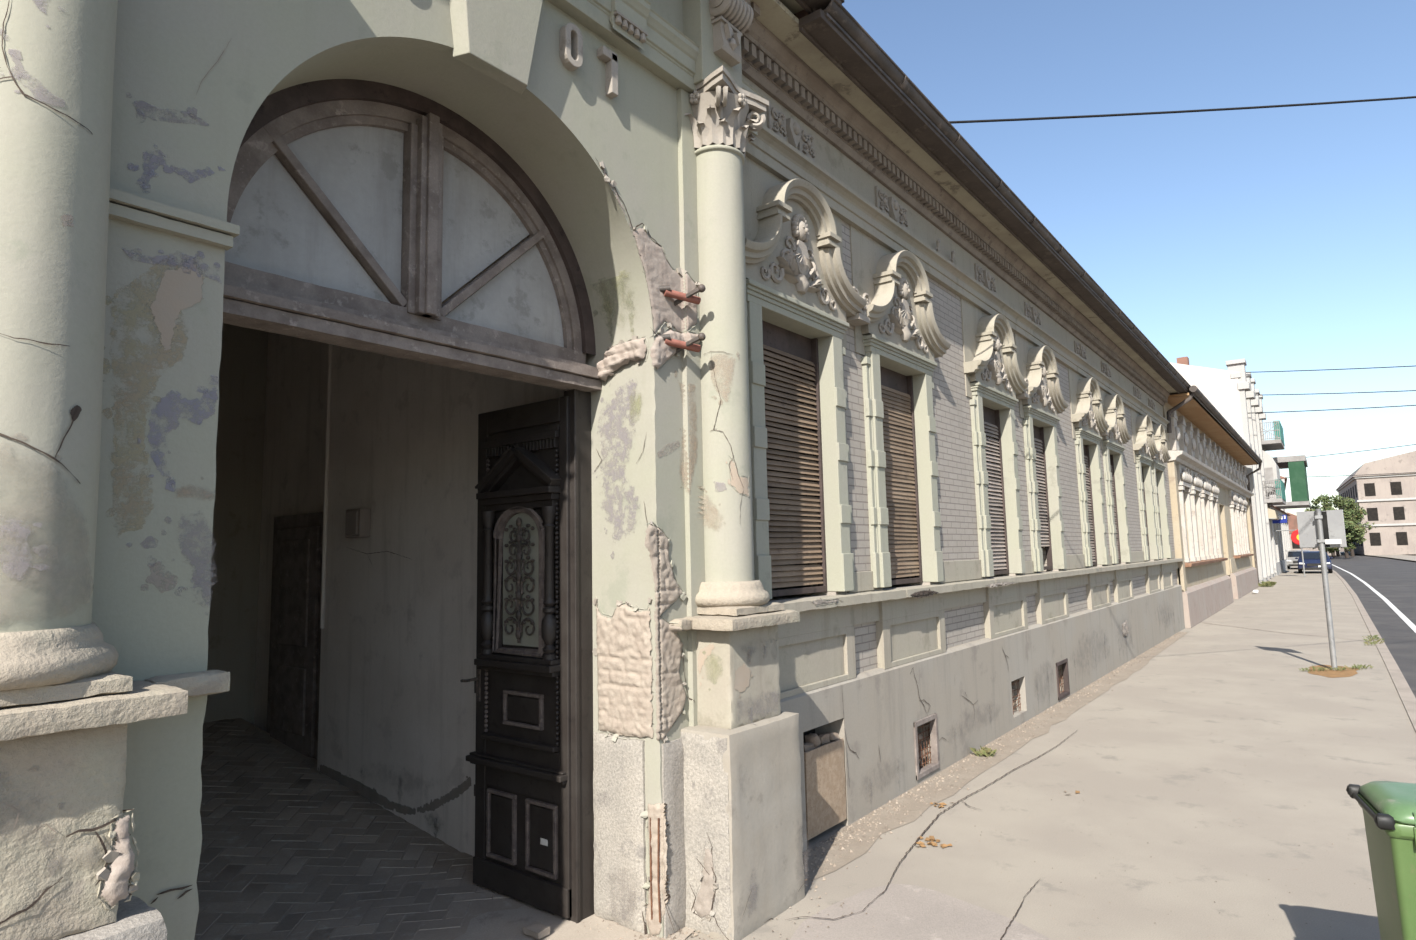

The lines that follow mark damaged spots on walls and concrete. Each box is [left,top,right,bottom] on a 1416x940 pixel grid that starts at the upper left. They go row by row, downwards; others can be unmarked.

crack [0,2,93,135]
crack [0,333,68,346]
peeling [123,248,220,351]
crack [0,408,80,483]
peeling [137,375,218,492]
flaking render [592,161,717,743]
crack [703,351,744,506]
peeling [126,517,214,603]
crack [910,667,975,741]
crack [0,877,63,924]
crack [4,803,193,904]
flaking render [96,810,140,910]